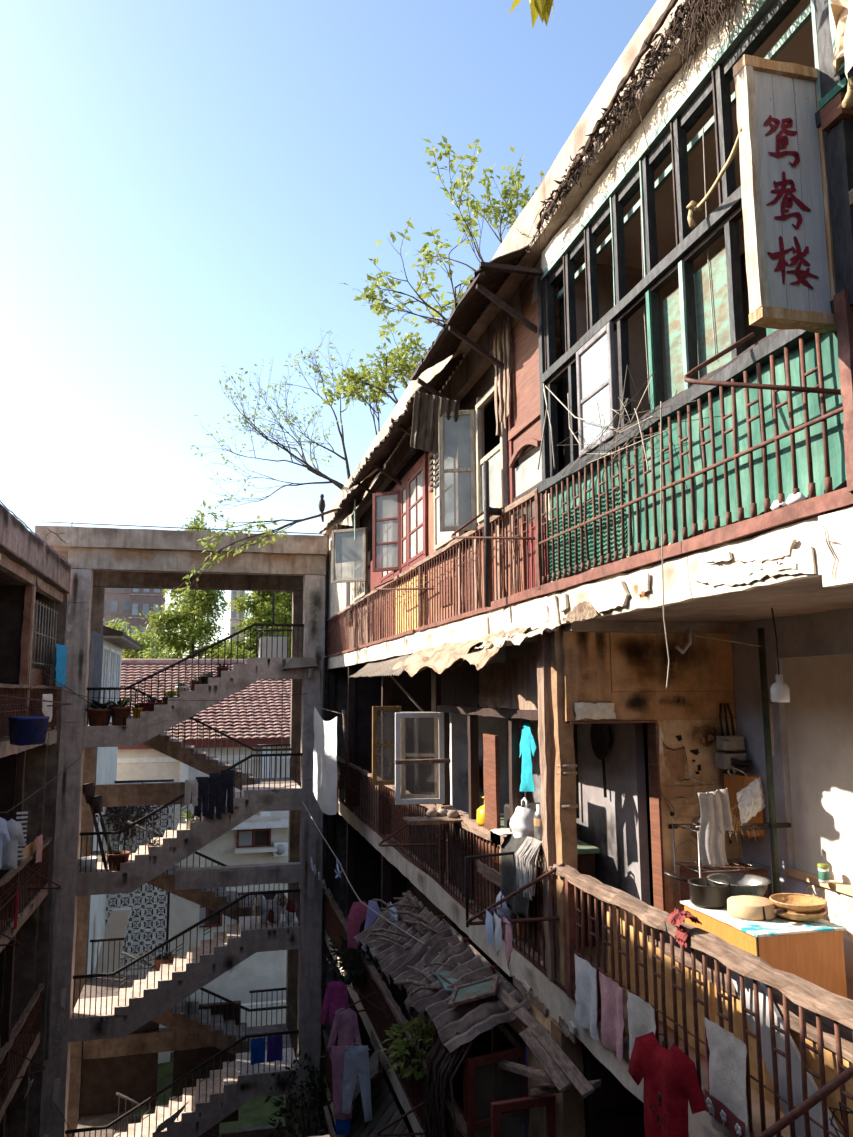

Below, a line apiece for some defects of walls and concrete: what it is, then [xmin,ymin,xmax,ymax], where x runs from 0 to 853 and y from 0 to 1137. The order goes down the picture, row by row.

spalling [693,539,816,586]
damp [628,695,646,711]
flaking render [658,725,716,783]